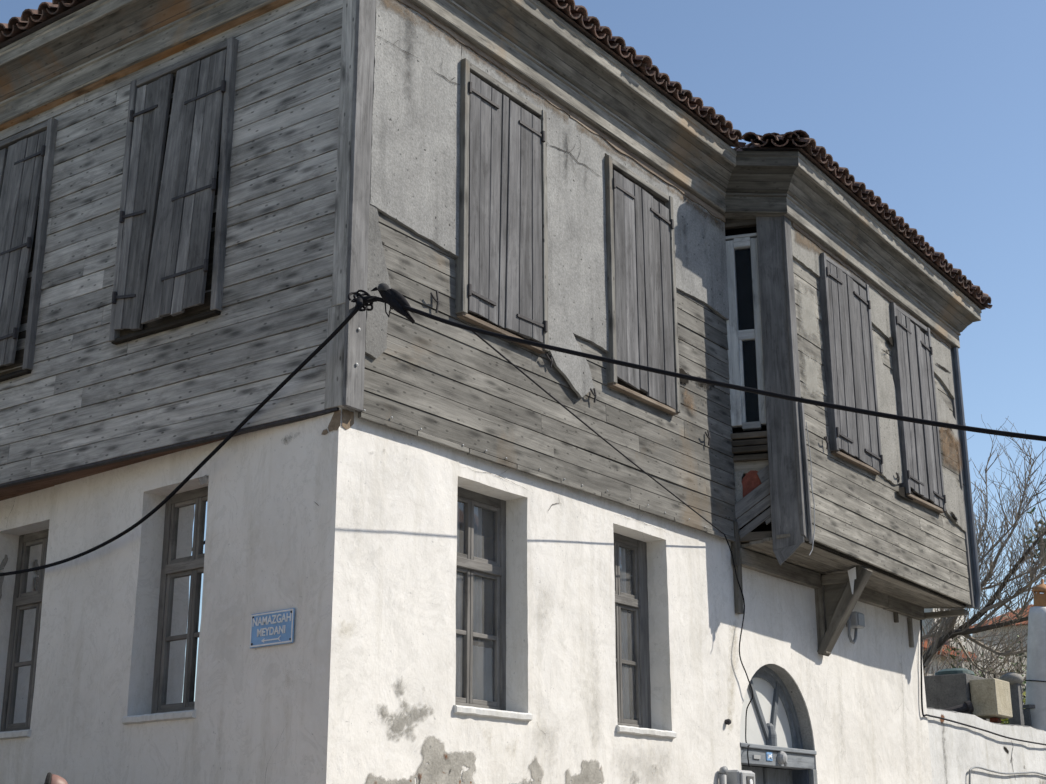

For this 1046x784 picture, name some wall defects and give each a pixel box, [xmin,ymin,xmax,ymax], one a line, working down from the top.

crack [550,135,600,176]
peeling [381,681,432,740]
peeling [365,737,476,784]
peeling [521,758,544,784]
peeling [566,760,604,784]